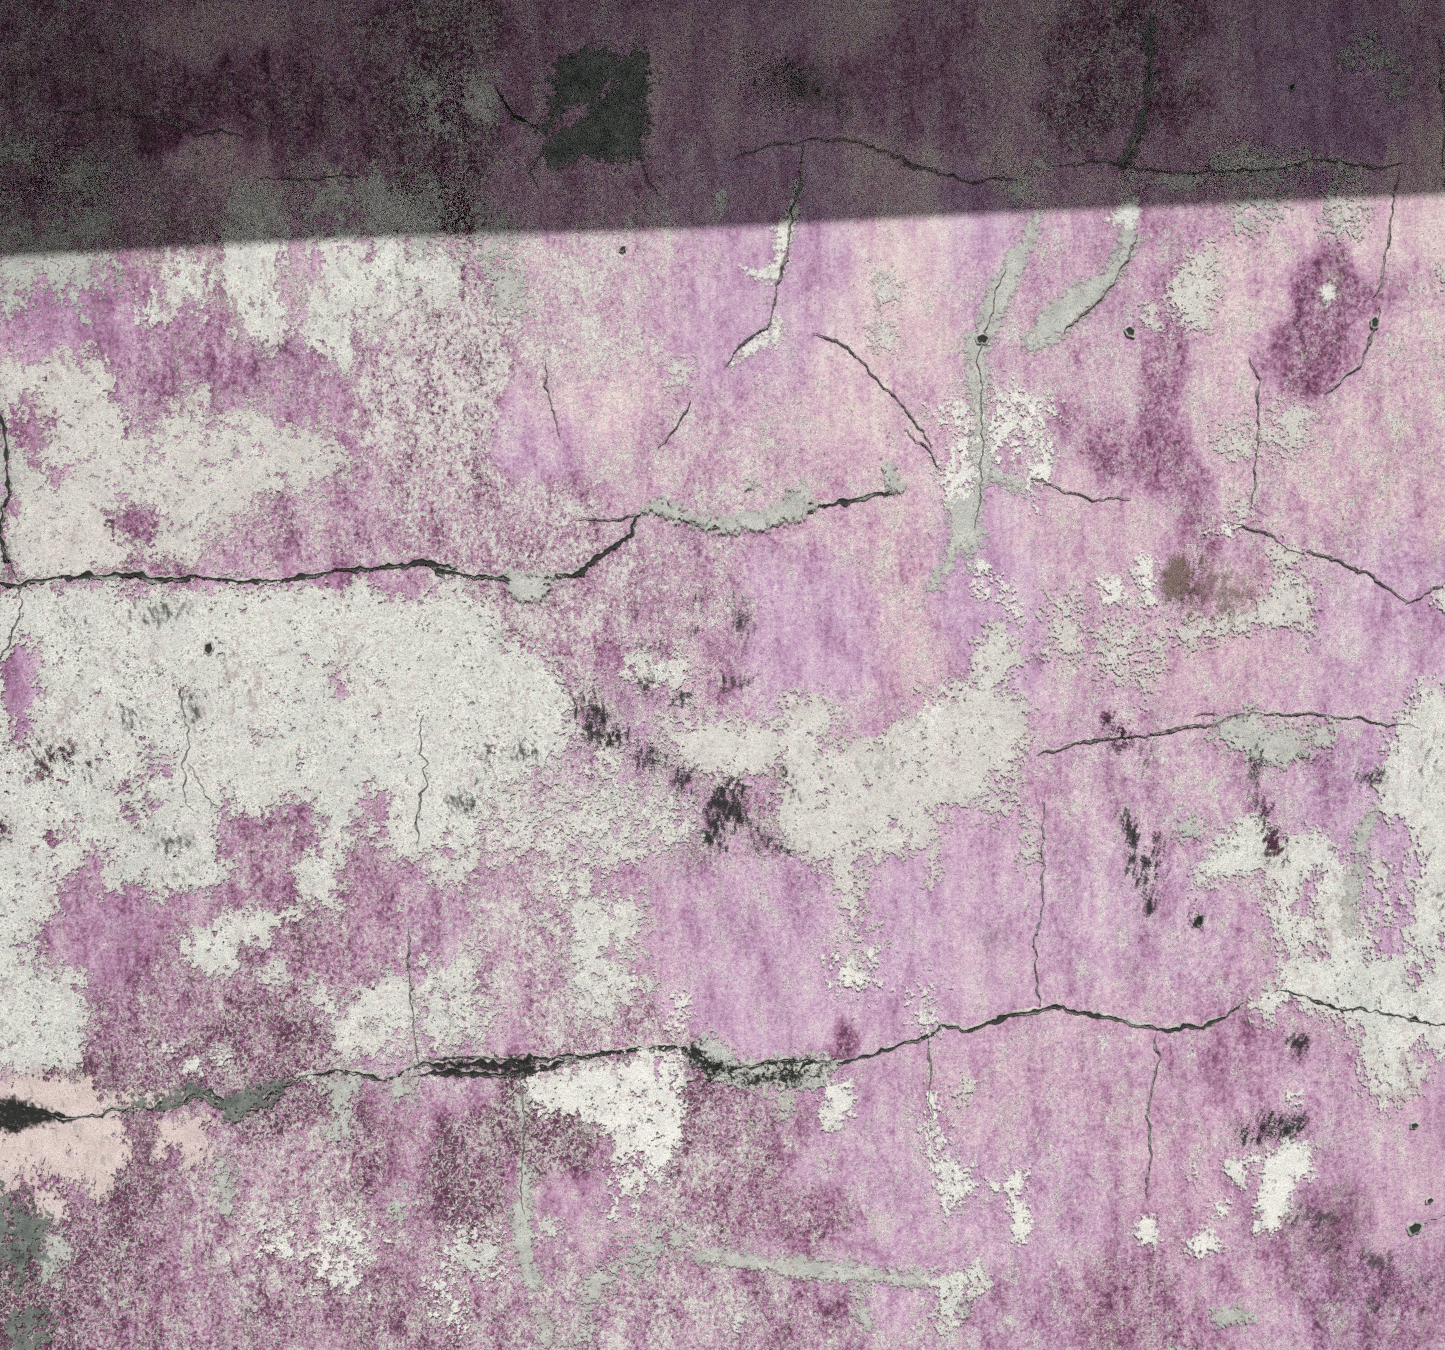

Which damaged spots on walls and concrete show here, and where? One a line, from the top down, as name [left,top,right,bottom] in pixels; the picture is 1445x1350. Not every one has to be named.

peeling [398,64,520,146]
spalling [527,38,661,175]
peeling [0,105,543,387]
peeling [738,178,808,286]
crack [725,136,1018,365]
crack [0,412,898,659]
crack [813,208,1147,593]
crack [1228,357,1445,603]
peeling [0,328,1346,1350]
crack [1038,711,1420,754]
peeling [1171,671,1445,1120]
crack [0,801,1445,1292]